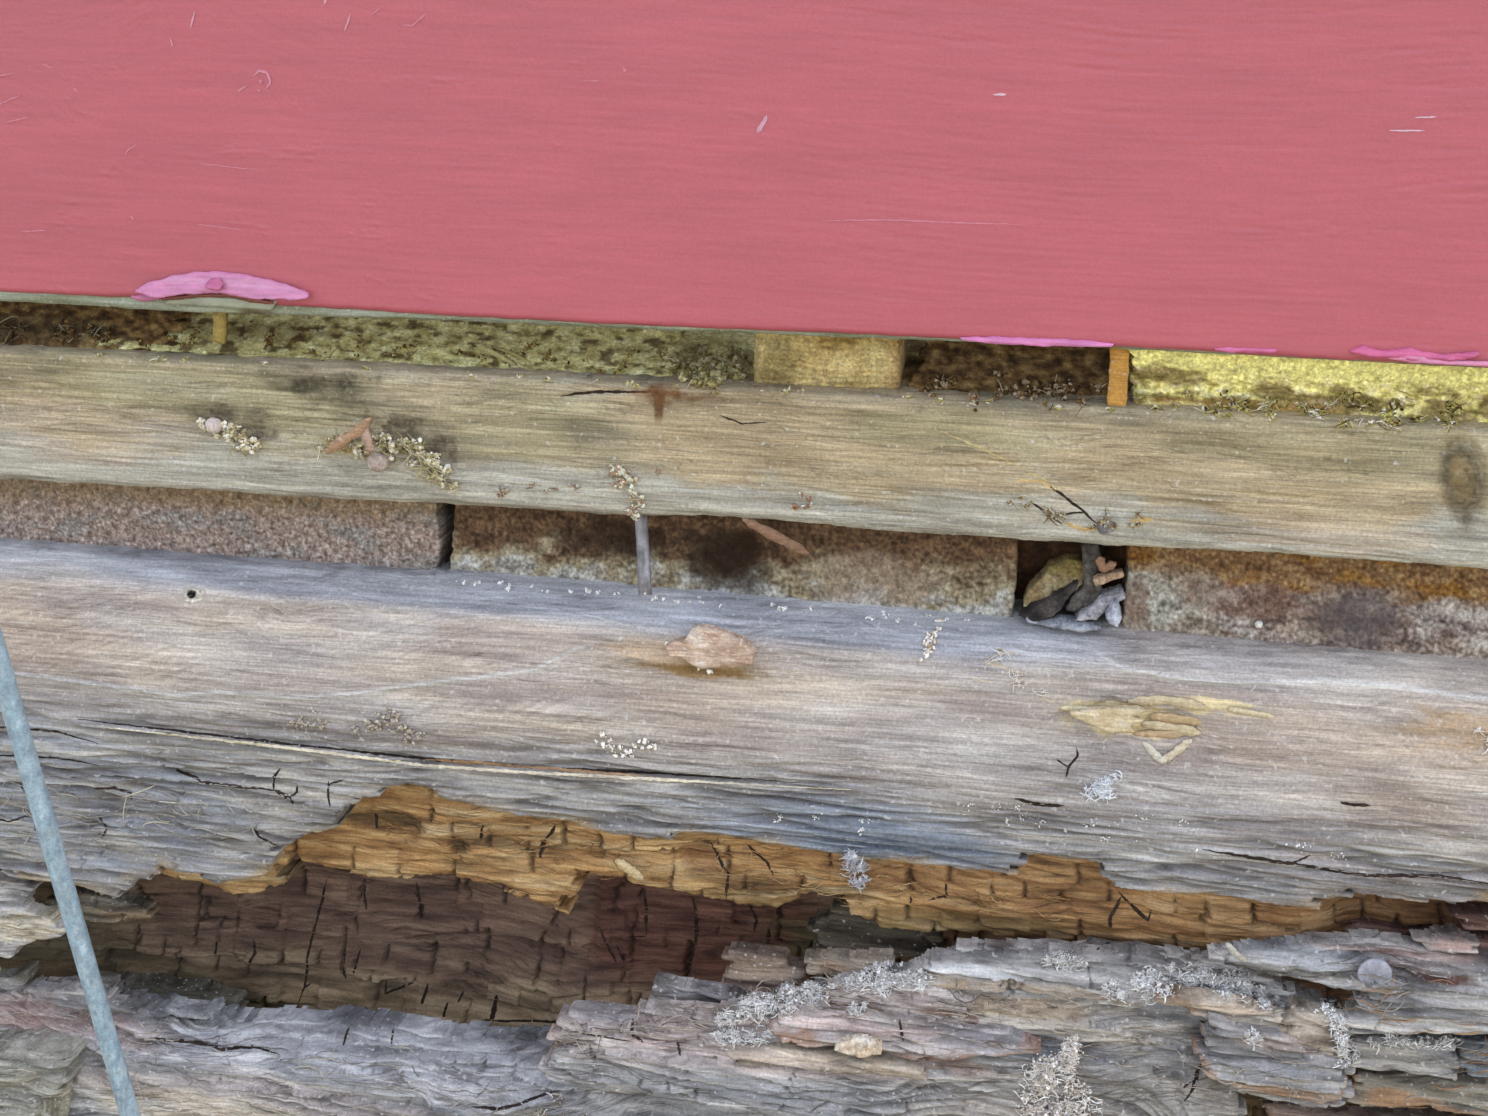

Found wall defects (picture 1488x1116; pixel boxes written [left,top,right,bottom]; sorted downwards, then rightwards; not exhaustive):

peeling [1350,345,1488,367]
rust [647,385,703,417]
crack [0,719,851,838]
crack [254,830,278,846]
crack [538,826,556,858]
crack [214,939,257,964]
crack [296,878,681,1056]
peeling [834,1033,882,1058]